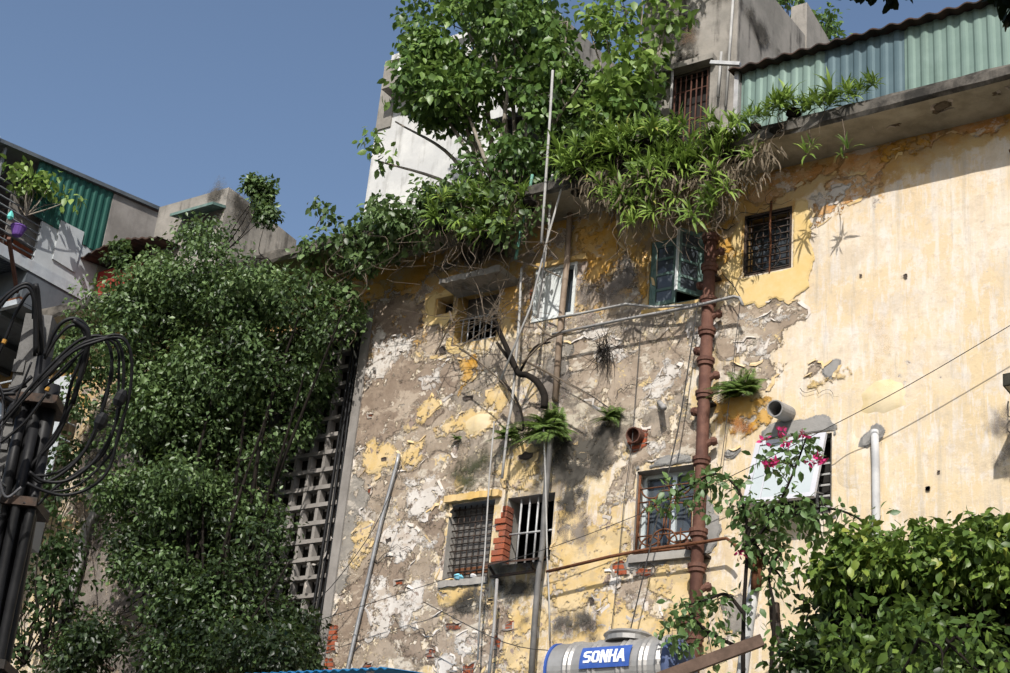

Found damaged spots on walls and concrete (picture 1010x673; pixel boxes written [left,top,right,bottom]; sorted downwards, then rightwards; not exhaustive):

leakage [661,11,699,63]
leakage [741,2,780,53]
flaking render [712,298,811,392]
flaking render [803,358,842,382]
flaking render [324,248,702,673]
leakage [551,422,621,542]
flaking render [725,445,741,459]
flaking render [719,589,747,637]